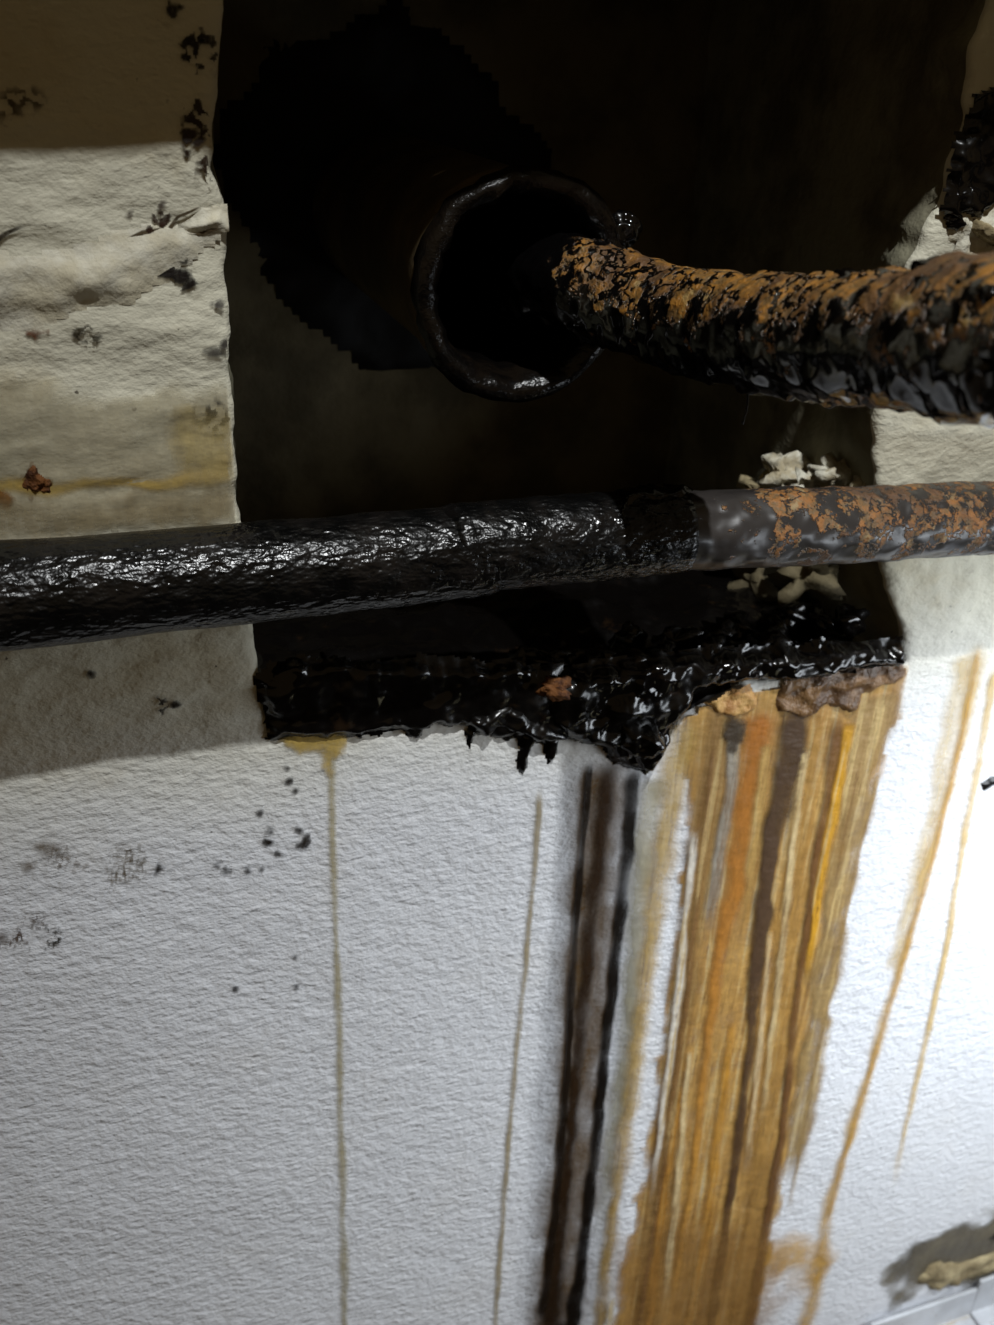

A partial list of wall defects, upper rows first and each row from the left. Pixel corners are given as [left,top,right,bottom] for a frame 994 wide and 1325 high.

spalling [947,204,994,254]
water stain [285,735,347,885]
water stain [538,768,665,1325]
corrosion [596,665,908,1325]
water stain [765,662,994,1325]